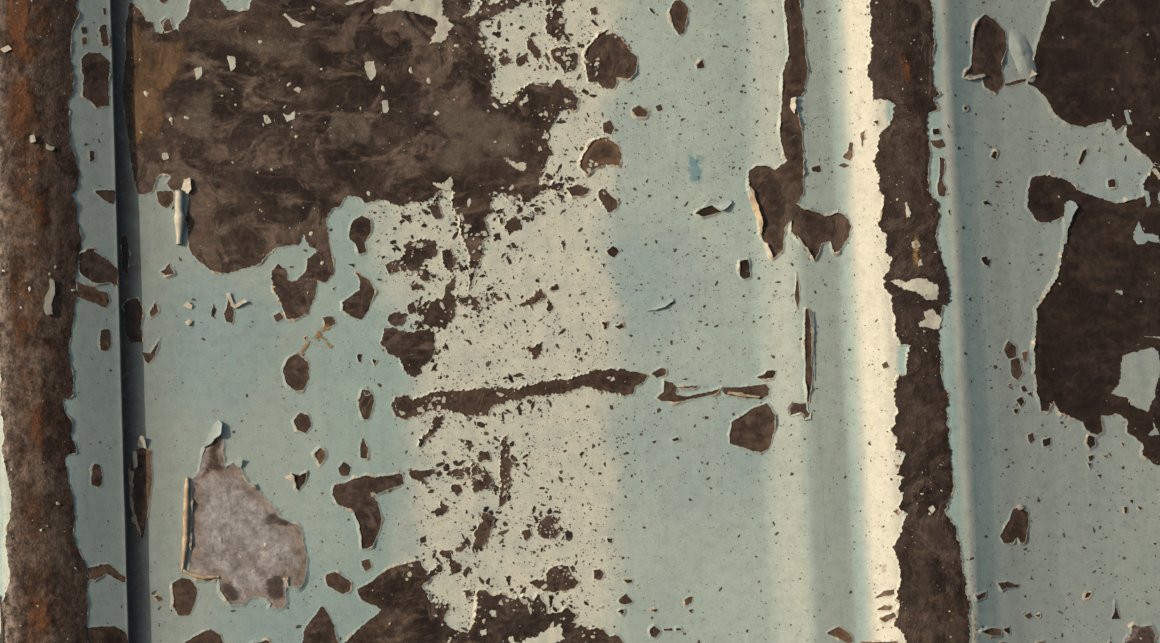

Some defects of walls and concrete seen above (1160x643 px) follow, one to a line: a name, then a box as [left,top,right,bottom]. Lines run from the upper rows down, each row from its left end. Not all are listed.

peeling [629,102,664,121]
peeling [837,119,880,169]
peeling [810,164,823,174]
peeling [962,0,1160,479]
corrosion [0,0,91,643]
peeling [76,0,640,643]
peeling [649,350,669,380]
peeling [755,368,778,383]
peeling [651,435,682,444]
peeling [726,401,779,456]
peeling [647,595,694,640]
peeling [1106,598,1160,643]